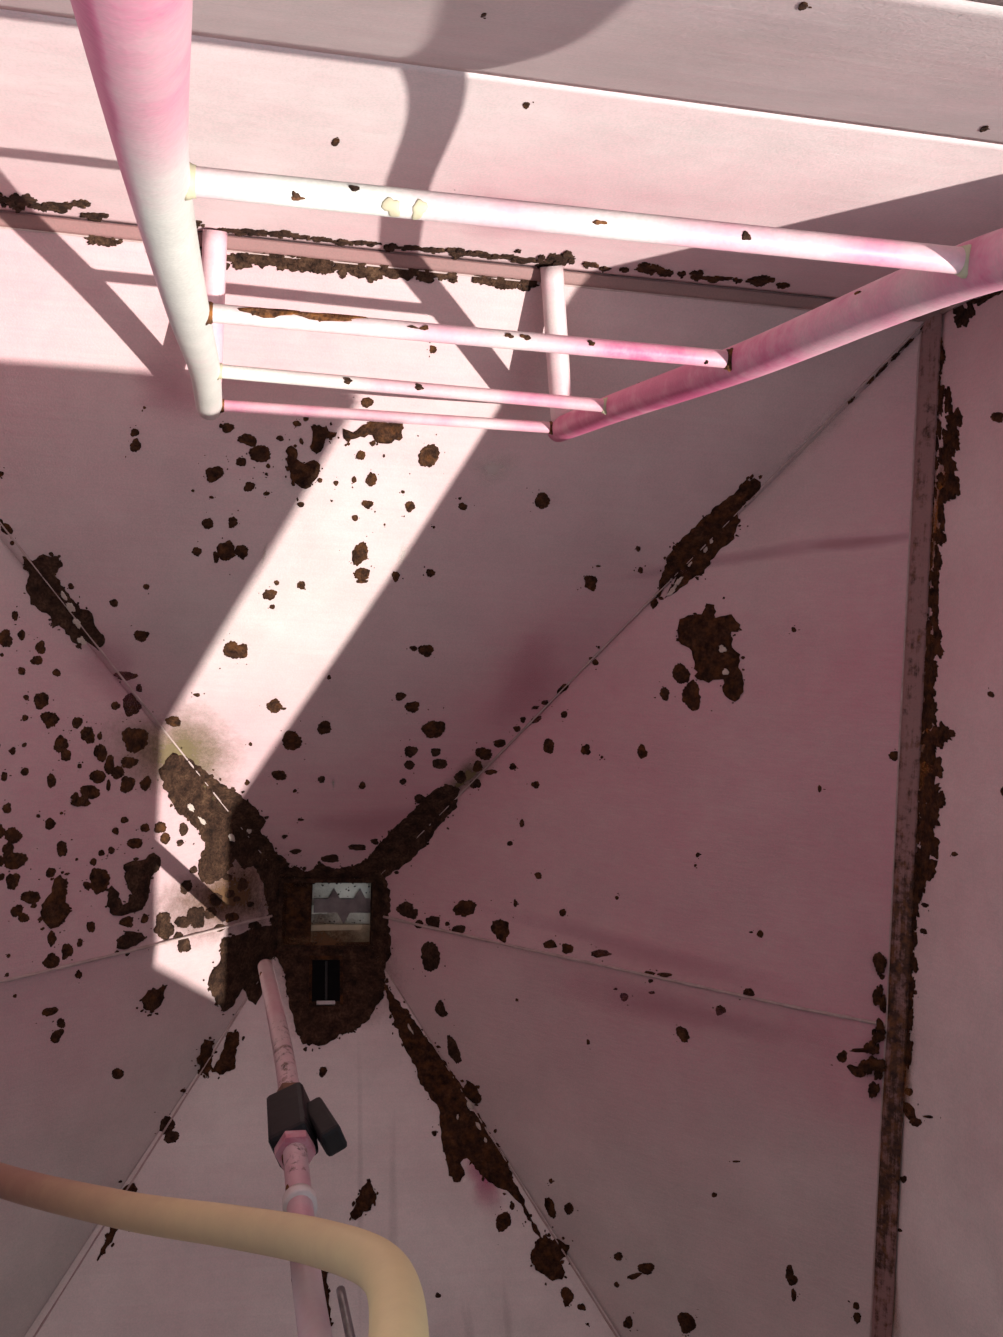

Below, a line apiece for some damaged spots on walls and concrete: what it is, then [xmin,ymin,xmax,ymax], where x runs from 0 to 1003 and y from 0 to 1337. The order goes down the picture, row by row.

rust [0,192,123,247]
rust [196,220,790,292]
rust [953,290,1003,328]
rust [0,519,105,677]
rust [219,633,248,669]
rust [258,580,279,609]
rust [191,377,445,583]
rust [633,474,762,609]
rust [654,597,745,711]
rust [902,337,963,1127]
rust [0,671,590,1327]
rust [831,952,887,1099]